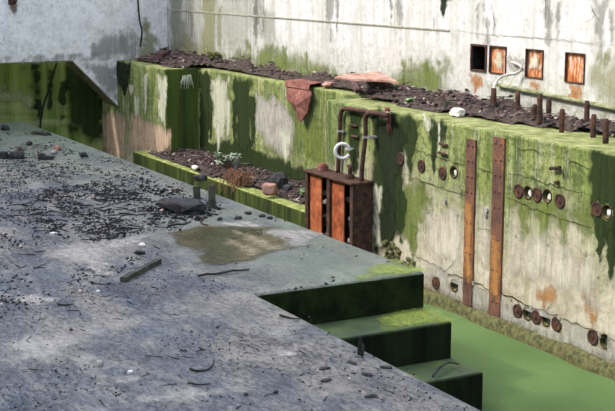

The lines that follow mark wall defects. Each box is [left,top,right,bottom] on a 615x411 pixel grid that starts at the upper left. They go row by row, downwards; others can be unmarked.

water stain [30,55,127,140]
efflorescence [158,75,167,121]
water stain [199,71,309,181]
water stain [348,111,362,173]
efflorescence [267,230,319,245]
water stain [371,107,418,257]
corrosion [464,203,472,282]
corrosion [490,235,500,296]
crack [412,254,615,341]
corrosion [536,286,556,308]
water stain [589,150,615,280]